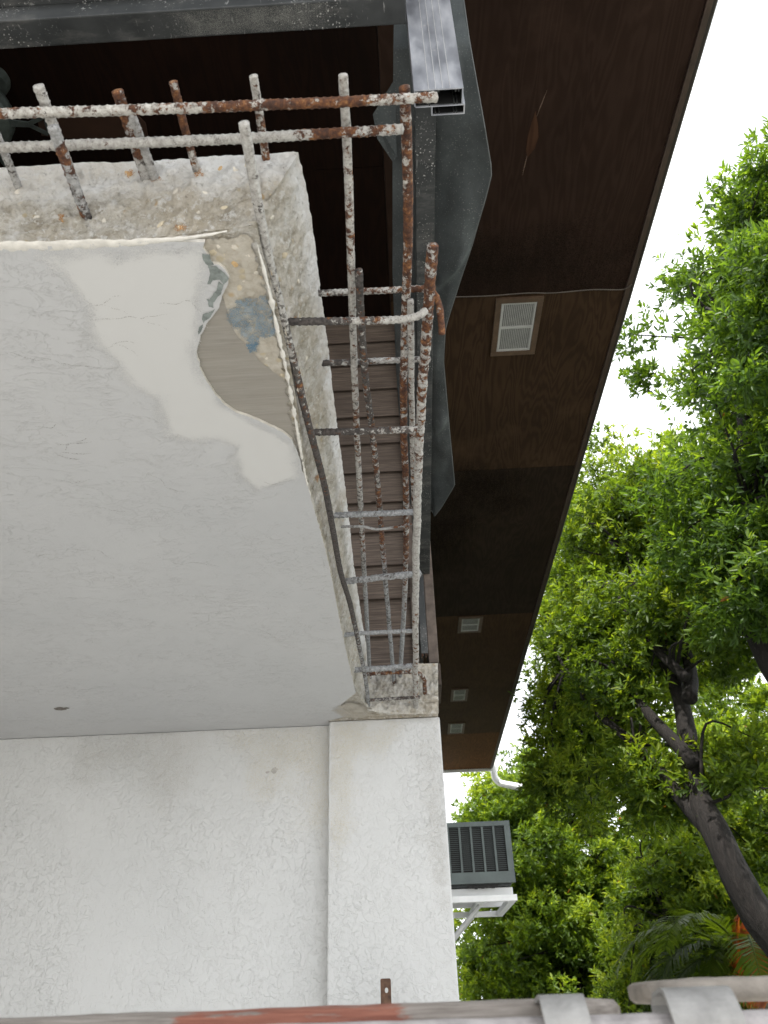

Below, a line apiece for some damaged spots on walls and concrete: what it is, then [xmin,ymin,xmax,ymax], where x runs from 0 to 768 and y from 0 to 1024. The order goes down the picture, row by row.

spalling [0,151,439,714]